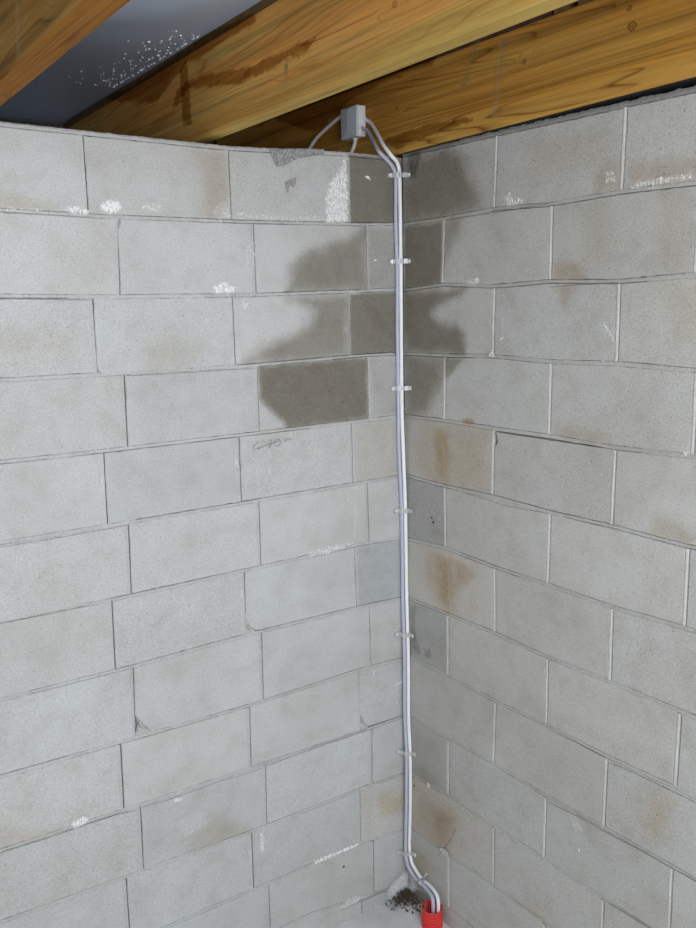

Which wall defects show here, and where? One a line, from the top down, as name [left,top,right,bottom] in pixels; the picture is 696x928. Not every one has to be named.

damp [239,158,349,223]
damp [100,199,121,214]
damp [213,281,236,293]